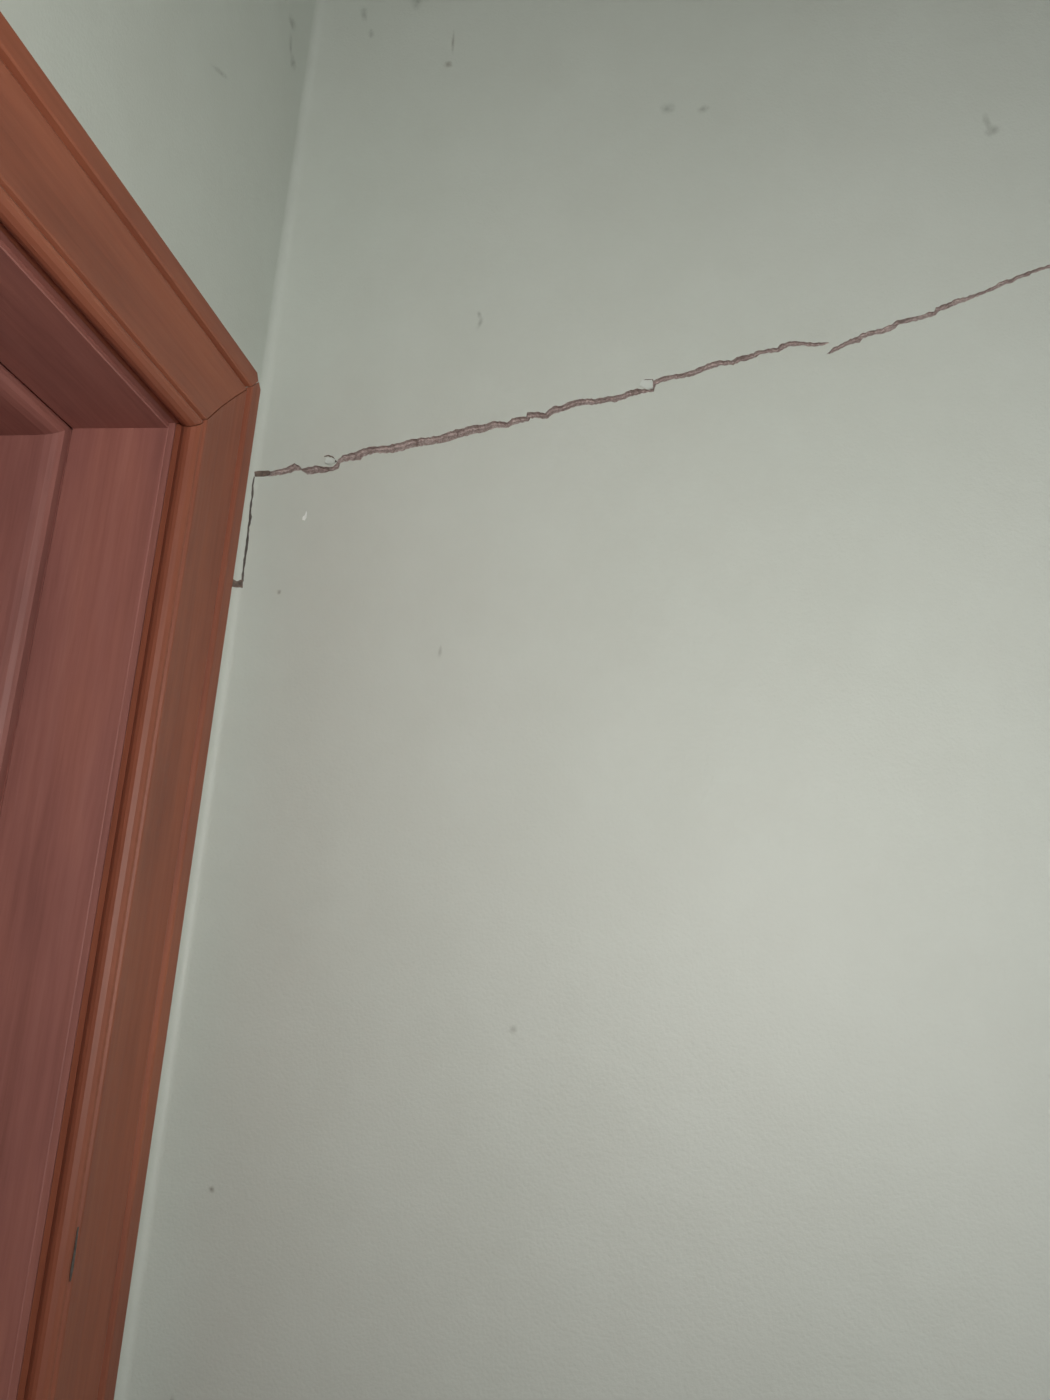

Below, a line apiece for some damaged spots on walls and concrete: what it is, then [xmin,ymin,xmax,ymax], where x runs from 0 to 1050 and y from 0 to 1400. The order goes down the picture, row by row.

crack [232,265,1050,588]